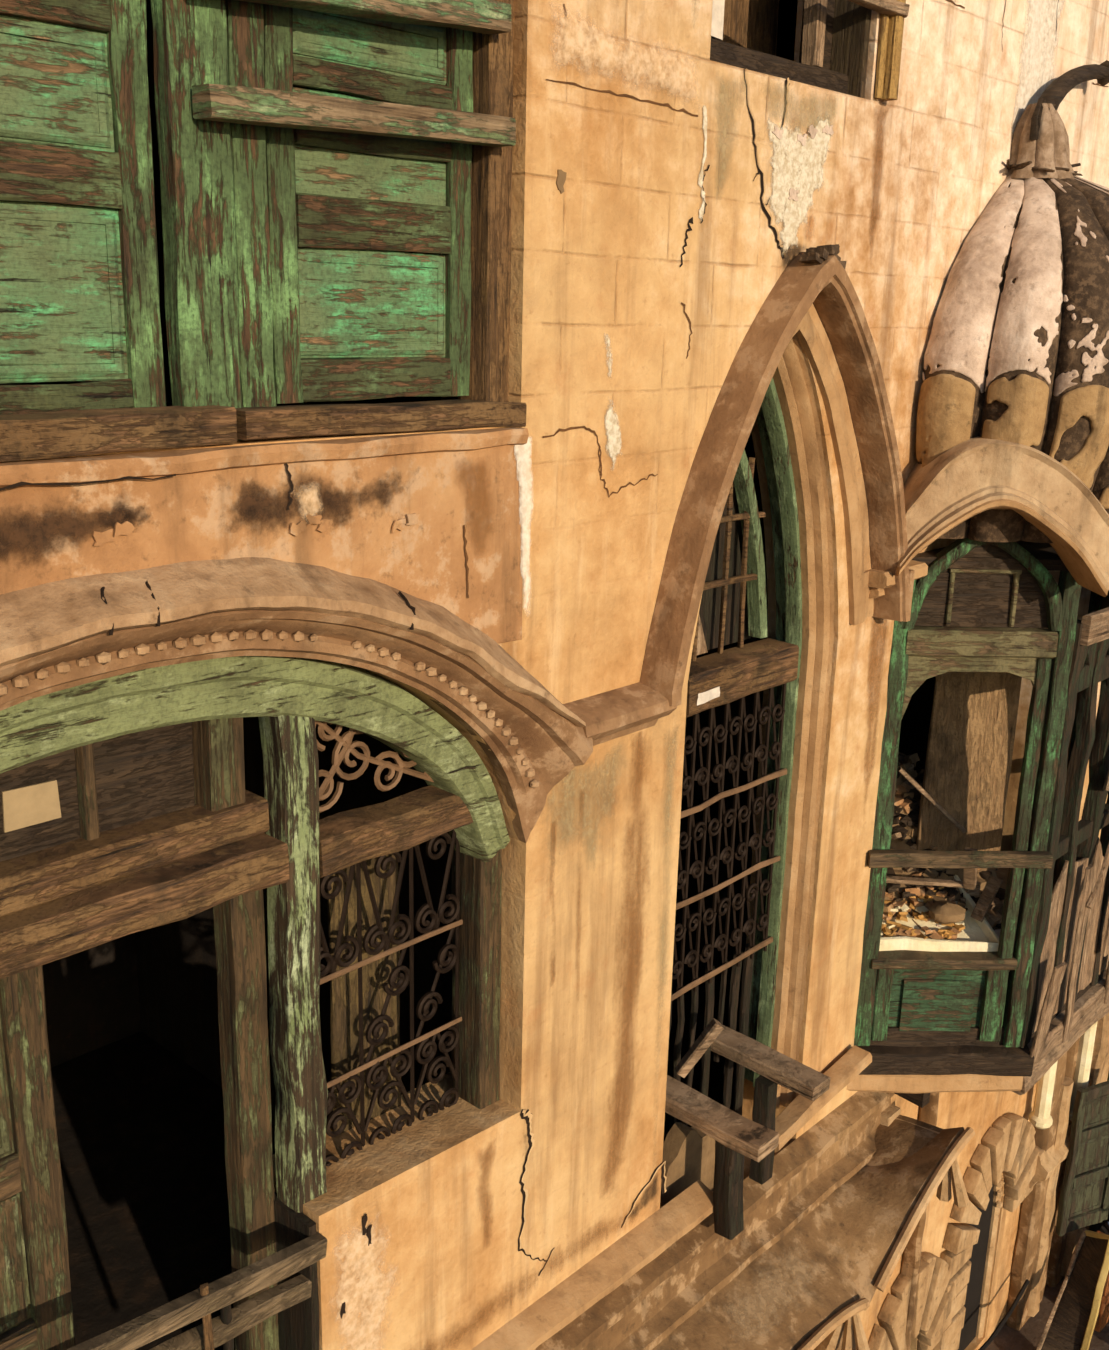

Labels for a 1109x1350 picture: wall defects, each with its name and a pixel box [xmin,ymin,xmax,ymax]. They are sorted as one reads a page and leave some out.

crack [546,79,698,117]
crack [744,69,790,259]
spalling [768,98,846,269]
crack [543,426,658,497]
peeling [605,406,621,465]
leakage [0,502,140,562]
leakage [234,478,396,528]
peeling [514,438,533,609]
crack [518,1109,555,1276]